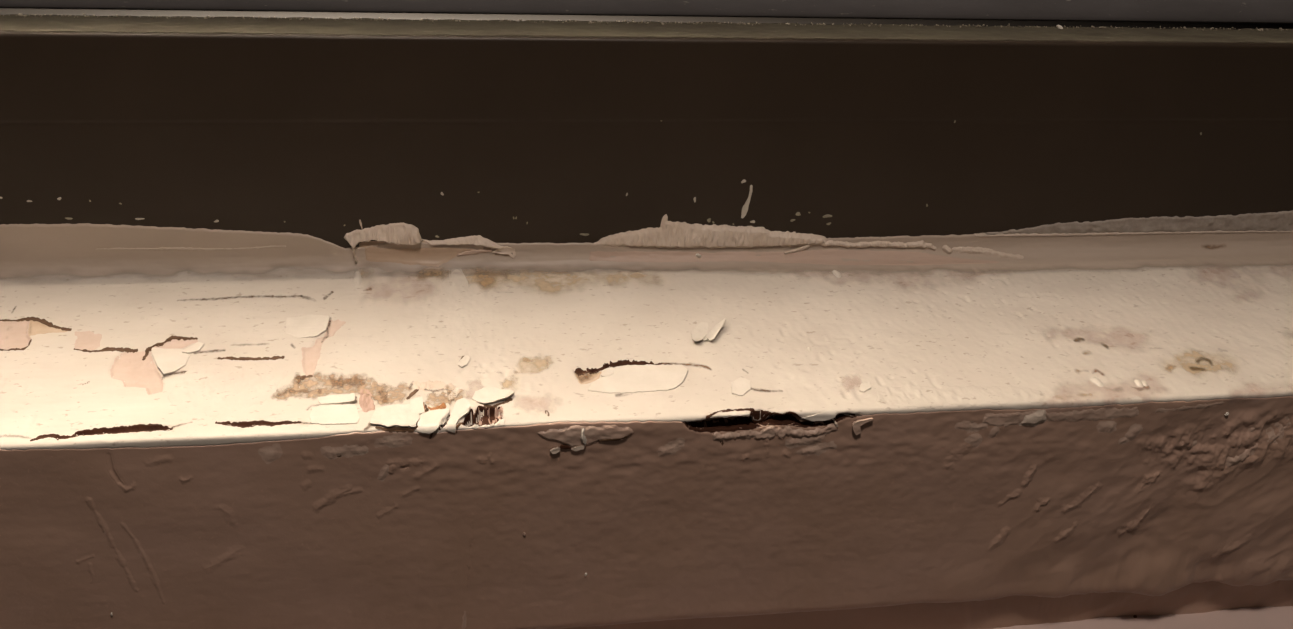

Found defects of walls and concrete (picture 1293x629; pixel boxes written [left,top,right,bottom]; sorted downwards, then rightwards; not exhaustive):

peeling [344,223,503,263]
peeling [594,214,827,249]
spalling [0,307,346,417]
crack [30,420,313,441]
spalling [300,380,514,460]
peeling [537,425,634,454]
spalling [656,377,1047,471]